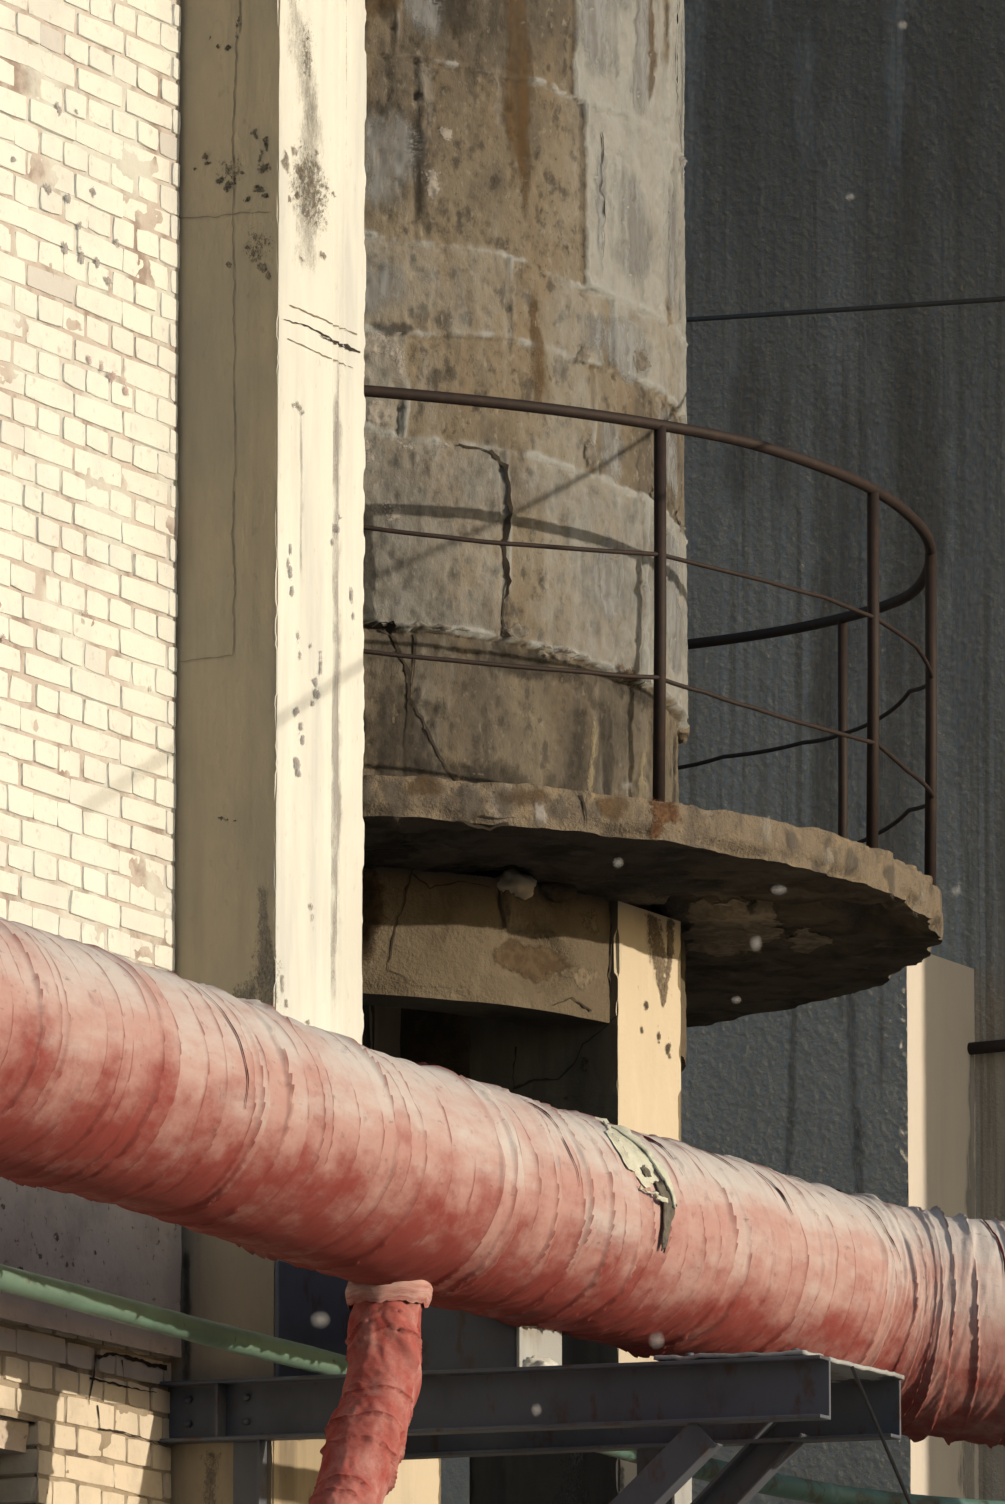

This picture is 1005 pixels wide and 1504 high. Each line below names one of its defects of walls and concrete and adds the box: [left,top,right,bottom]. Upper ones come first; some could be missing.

rust [504,0,533,203]
crack [284,305,360,368]
rust [530,299,544,402]
crack [458,443,513,638]
rust [650,799,682,838]
leakage [233,888,280,1005]
spalling [362,868,599,990]
spalling [645,898,834,1010]
crack [89,1352,167,1447]